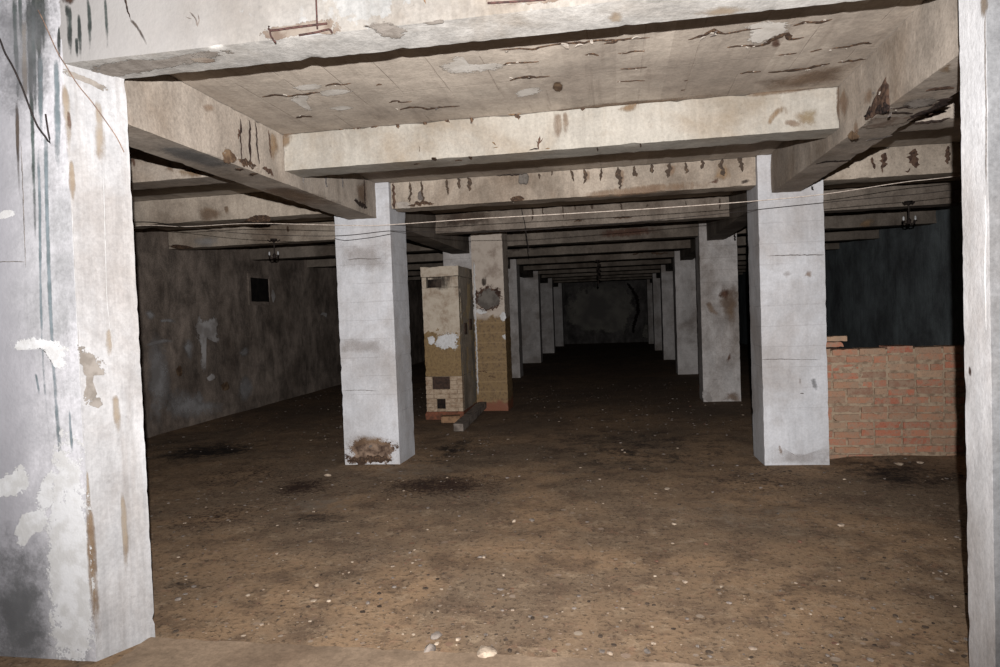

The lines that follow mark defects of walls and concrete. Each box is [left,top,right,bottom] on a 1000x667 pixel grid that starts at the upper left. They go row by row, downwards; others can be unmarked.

spalling [859,77,954,141]
damp [13,0,92,341]
peeling [0,210,15,219]
spalling [472,279,506,321]
peeling [12,337,106,408]
peeling [428,332,459,349]
damp [52,364,73,451]